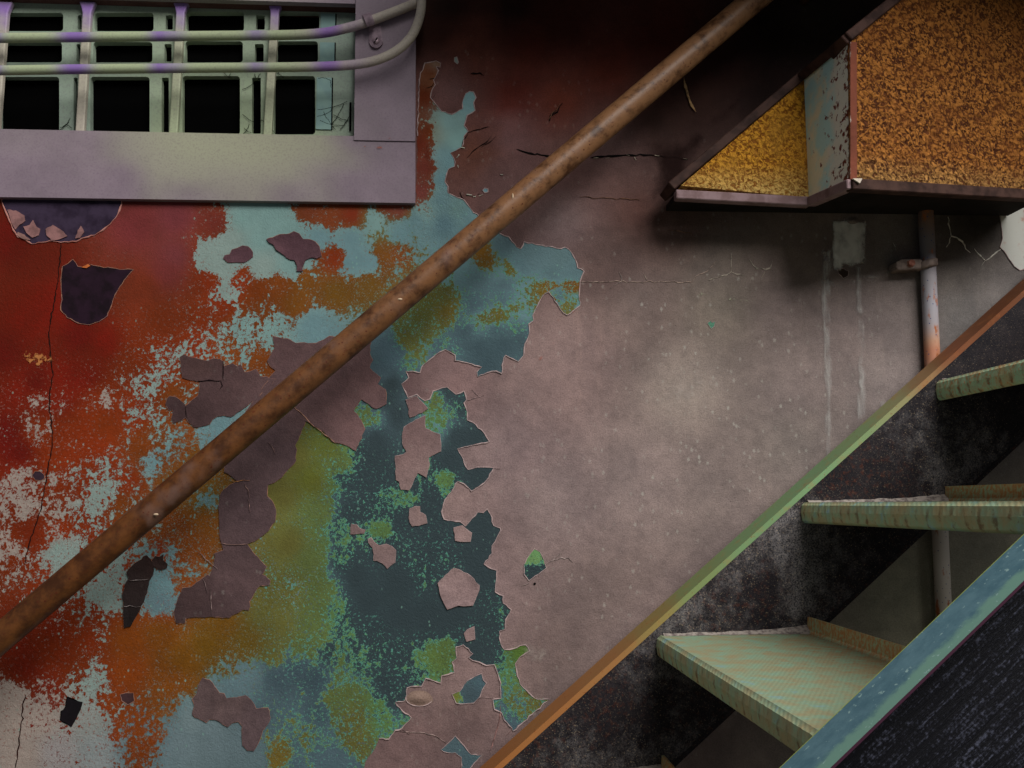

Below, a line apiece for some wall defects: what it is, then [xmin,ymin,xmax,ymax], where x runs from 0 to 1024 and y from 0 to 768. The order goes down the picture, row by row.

crack [462,126,496,158]
crack [590,153,688,161]
water stain [823,221,865,303]
crack [946,217,1001,266]
peeling [1000,208,1024,271]
peeling [0,61,479,619]
crack [25,246,62,563]
peeling [0,233,585,768]
crack [15,694,26,768]